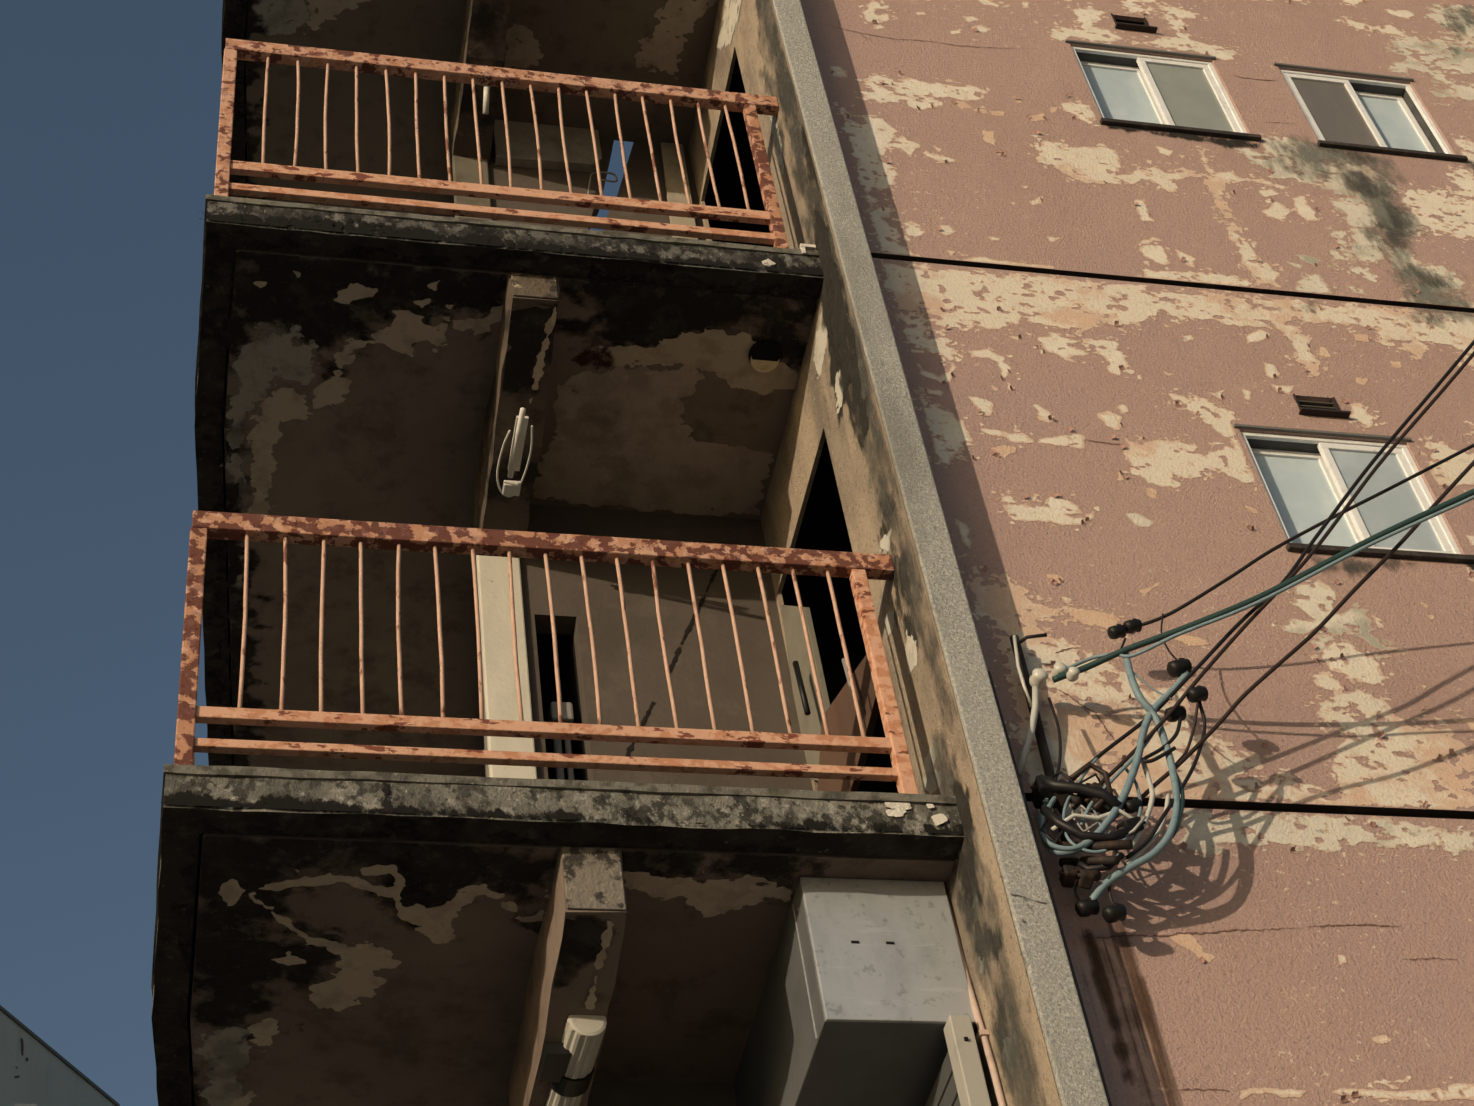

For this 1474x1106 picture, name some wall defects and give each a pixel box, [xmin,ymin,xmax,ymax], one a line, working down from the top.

peeling [950,0,1242,64]
peeling [1252,0,1474,106]
peeling [221,280,503,515]
damp [202,0,951,715]
peeling [529,306,843,517]
peeling [830,66,1474,531]
damp [1280,141,1471,321]
damp [204,540,273,767]
peeling [955,519,1474,867]
peeling [218,864,550,1011]
damp [161,790,822,1040]
damp [748,738,1036,1106]